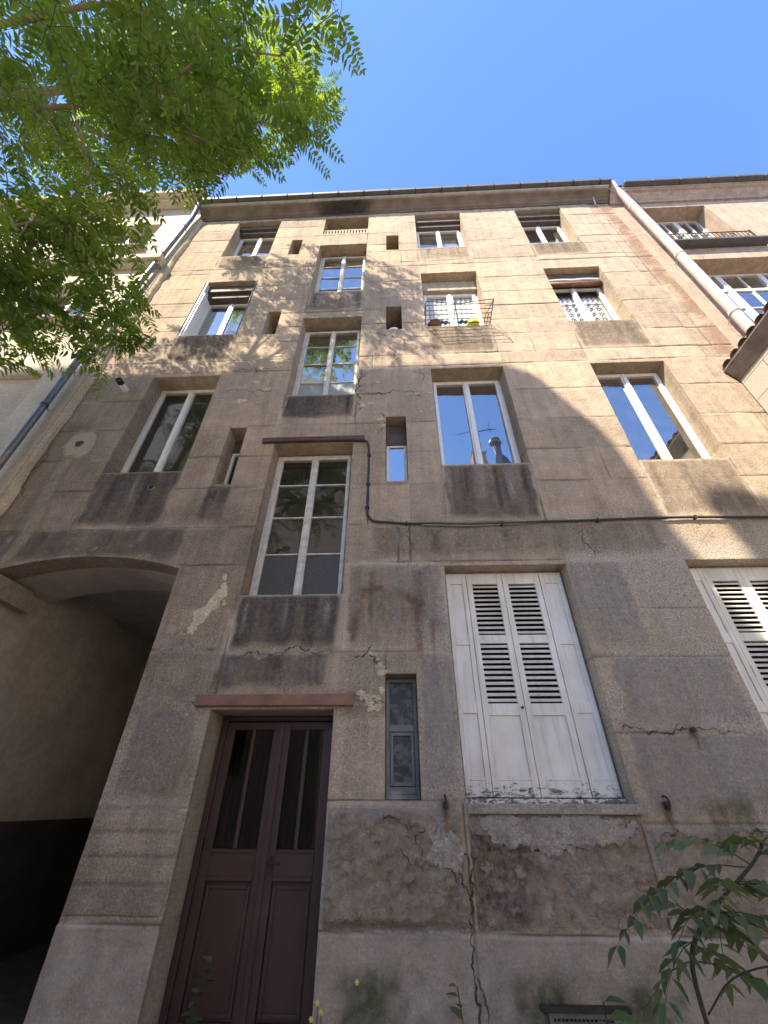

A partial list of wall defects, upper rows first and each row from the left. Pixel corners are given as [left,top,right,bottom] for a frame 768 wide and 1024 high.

crack [352,332,425,433]
damp [74,472,185,541]
damp [447,465,537,514]
flaking render [187,574,229,635]
damp [159,596,338,685]
crack [224,645,377,664]
spalling [356,650,391,712]
crack [622,723,755,736]
crack [382,815,572,1024]
flaking render [399,802,638,931]
spalling [618,866,673,934]